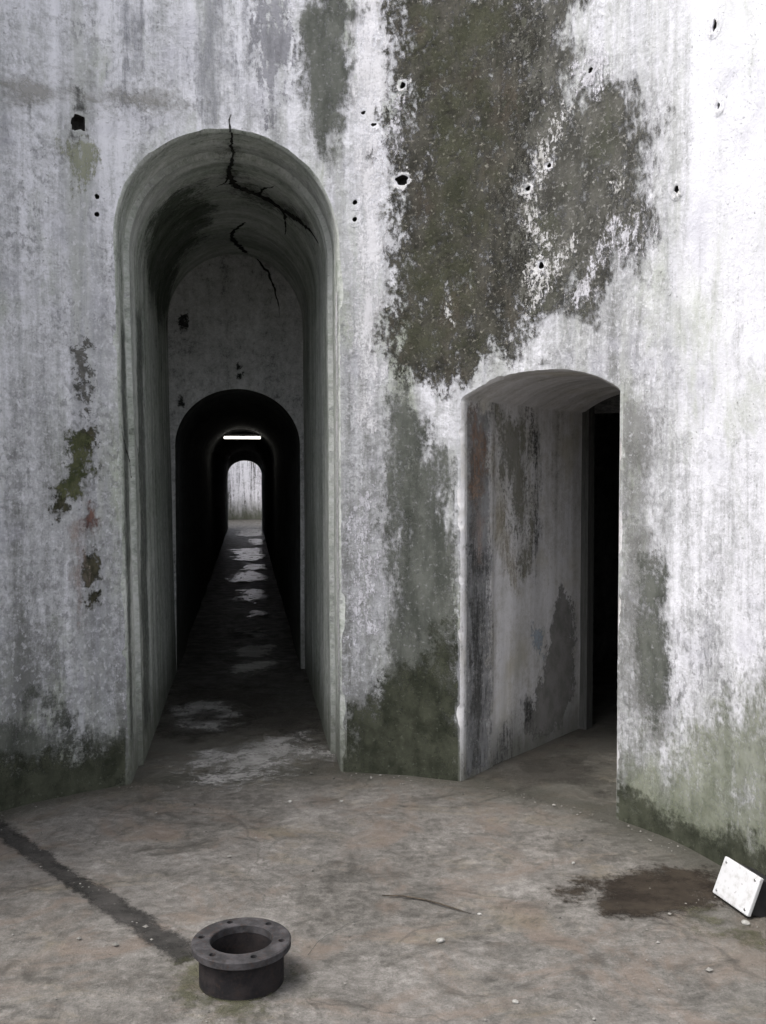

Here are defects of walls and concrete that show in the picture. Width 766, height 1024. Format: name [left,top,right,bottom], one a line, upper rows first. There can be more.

spalling [66,107,91,139]
damp [116,3,165,105]
crack [217,115,318,306]
damp [231,0,603,793]
damp [0,312,335,792]
damp [620,403,679,745]
damp [548,864,725,920]